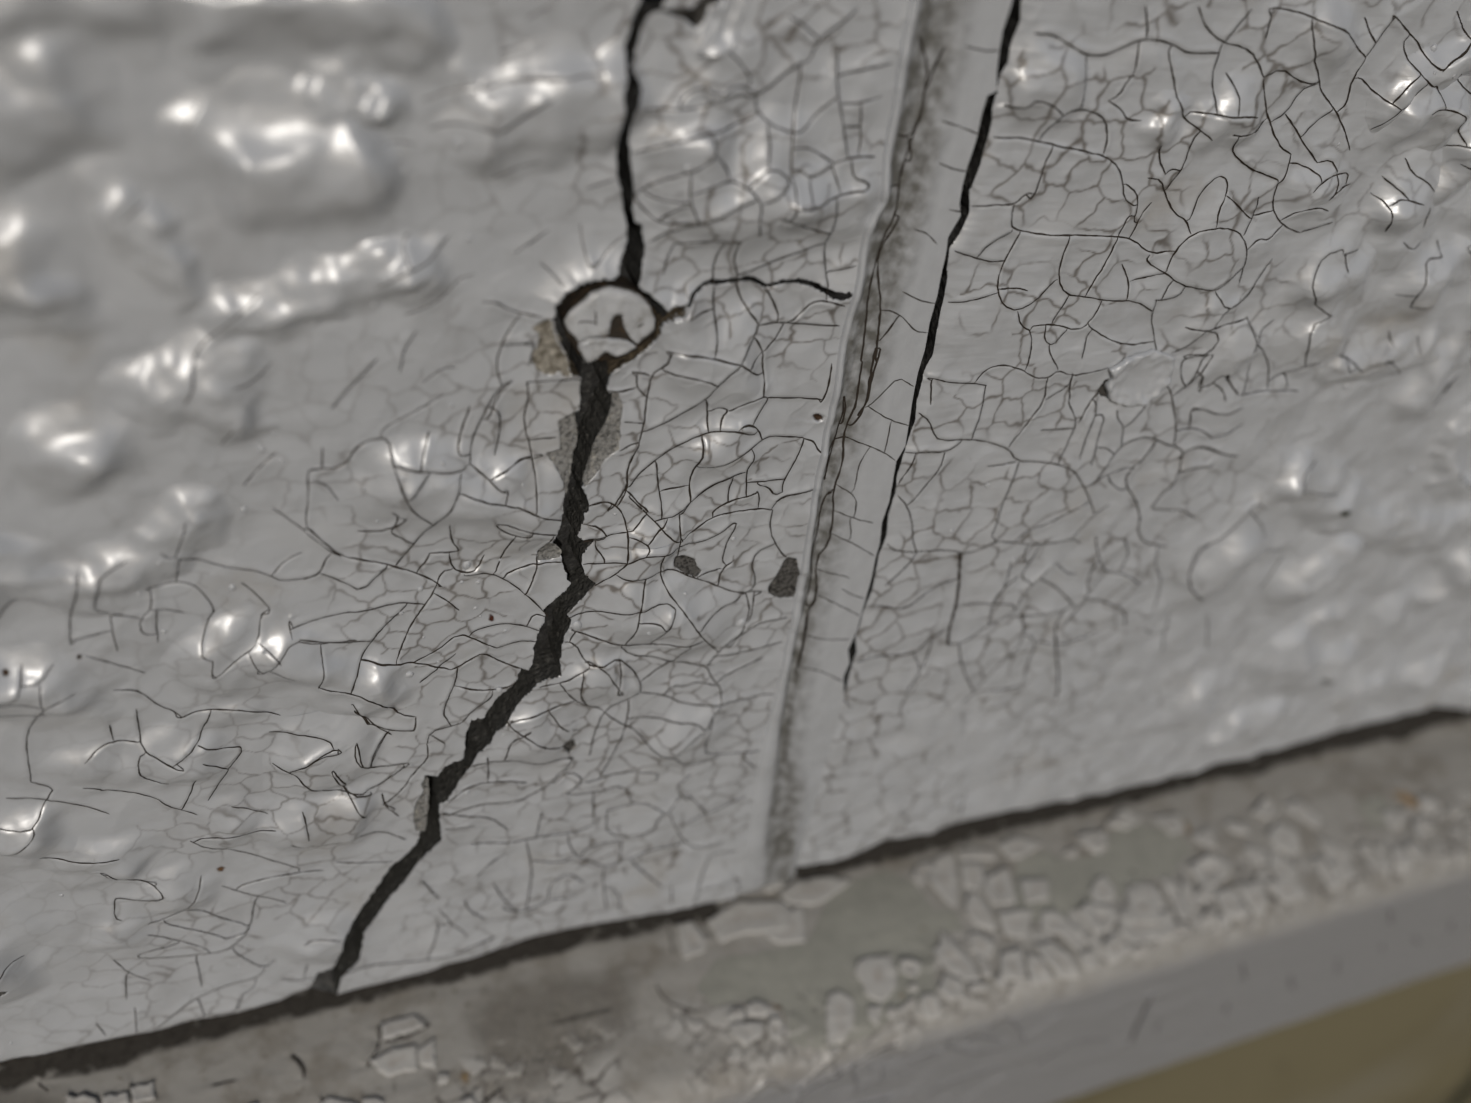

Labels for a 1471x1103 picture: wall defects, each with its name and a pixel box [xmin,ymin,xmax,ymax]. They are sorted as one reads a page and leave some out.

crack [795,0,1471,708]
crack [69,0,893,993]
crack [0,664,279,856]
crack [40,858,164,921]
crack [114,807,324,1033]
peeling [676,874,852,959]
peeling [825,794,1464,1046]
peeling [66,1081,156,1103]
crack [290,1054,325,1101]
crack [366,1023,430,1067]
peeling [369,1014,450,1085]
peeling [725,1000,785,1047]